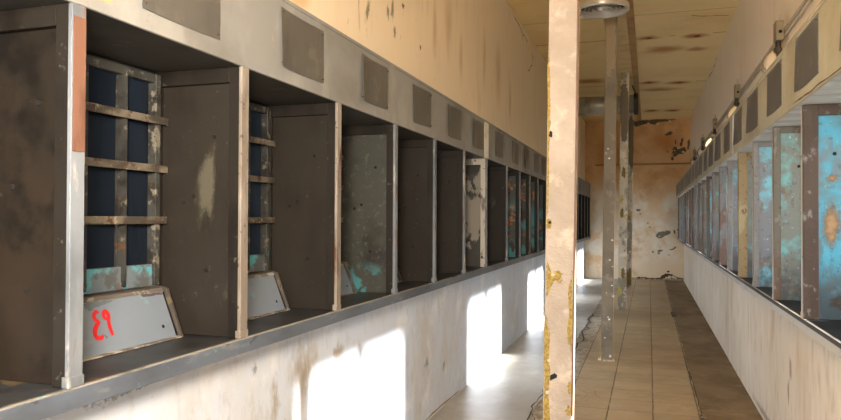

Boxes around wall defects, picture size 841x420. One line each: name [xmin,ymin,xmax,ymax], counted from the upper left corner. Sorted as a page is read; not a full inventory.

leakage [363,0,372,26]
leakage [385,0,397,41]
leakage [636,42,717,55]
leakage [579,77,605,86]
peeling [620,81,690,178]
peeling [609,259,631,287]
peeling [546,263,573,352]
leakage [268,329,347,420]
peeling [543,317,557,420]